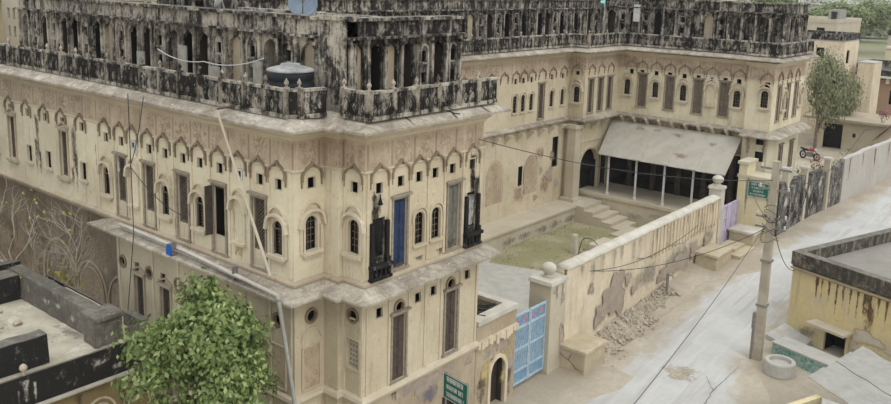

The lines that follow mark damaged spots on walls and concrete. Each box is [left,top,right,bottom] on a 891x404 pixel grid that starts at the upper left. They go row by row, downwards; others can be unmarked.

flaking render [589,269,637,329]
leakage [815,265,891,329]